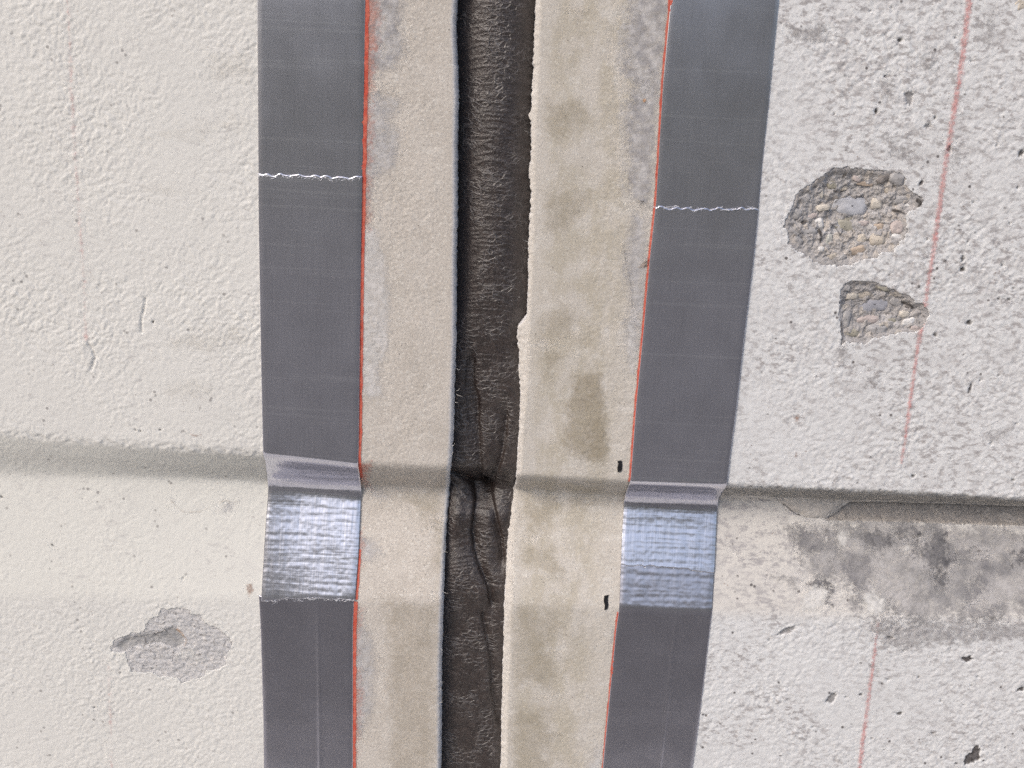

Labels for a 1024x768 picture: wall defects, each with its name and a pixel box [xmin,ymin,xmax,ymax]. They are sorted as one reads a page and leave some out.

spalling [783,166,923,267]
spalling [838,281,929,345]
damp [779,520,1024,650]
spalling [110,608,232,683]